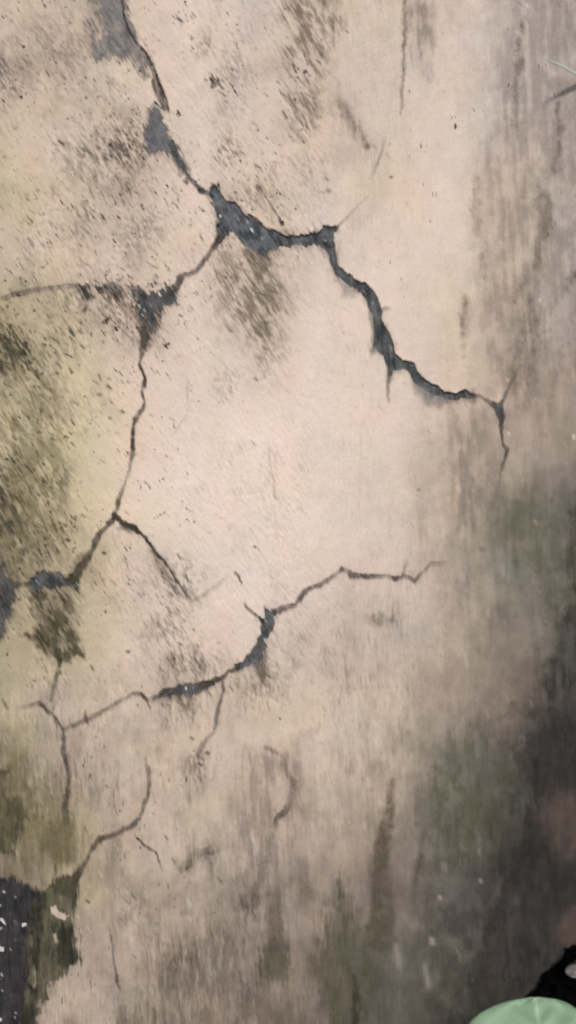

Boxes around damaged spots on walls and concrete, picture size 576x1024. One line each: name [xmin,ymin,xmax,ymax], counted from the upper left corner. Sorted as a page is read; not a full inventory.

crack [121,0,169,109]
crack [168,140,213,196]
crack [5,284,89,310]
crack [173,233,224,292]
crack [130,325,148,459]
crack [323,242,509,463]
crack [66,496,191,599]
crack [234,567,420,620]
crack [32,665,240,810]
crack [71,784,160,905]
leakage [375,797,393,874]
leakage [462,605,576,1024]